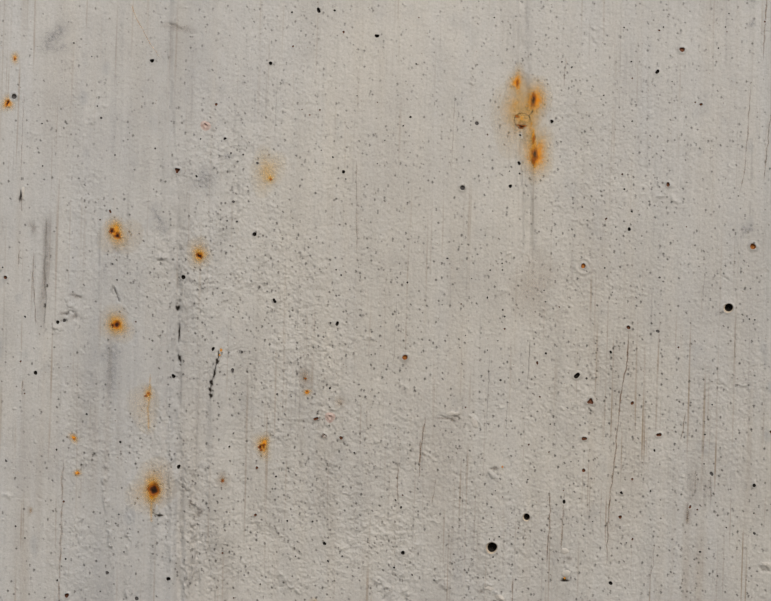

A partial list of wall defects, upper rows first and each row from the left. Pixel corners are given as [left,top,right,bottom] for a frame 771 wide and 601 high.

rust [514,91,544,167]
rust [147,481,159,499]